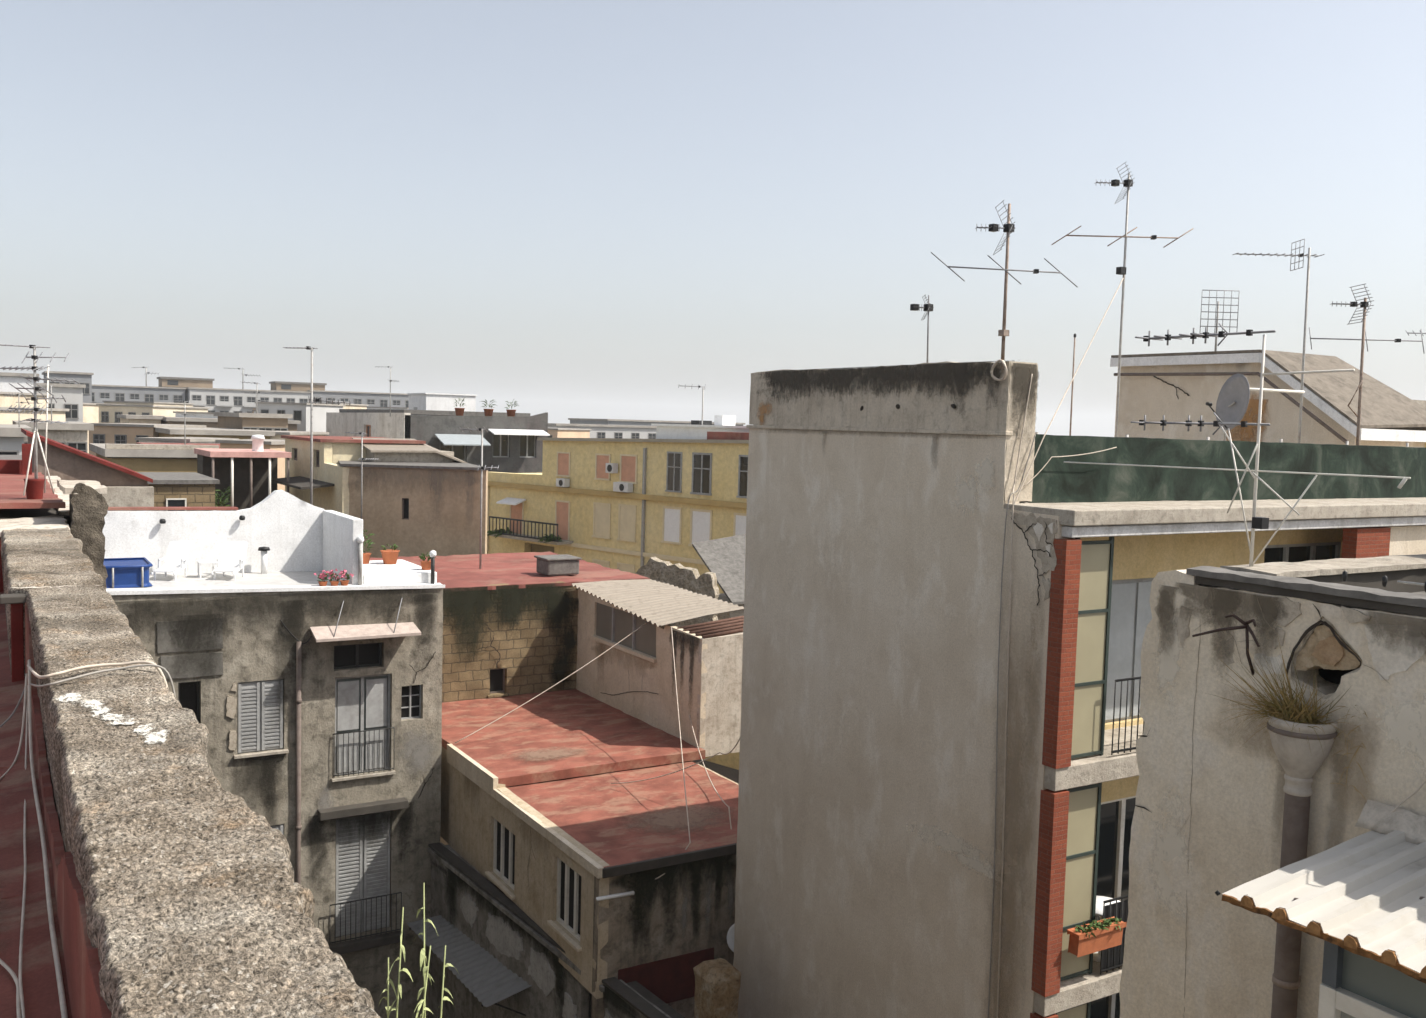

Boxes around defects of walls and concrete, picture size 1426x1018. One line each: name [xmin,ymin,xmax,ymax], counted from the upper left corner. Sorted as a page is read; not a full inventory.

leakage [765,361,1039,435]
flaking render [1010,512,1058,600]
leakage [115,583,579,695]
flaking render [1155,587,1255,648]
spalling [1254,597,1426,699]
crack [1132,591,1277,1012]